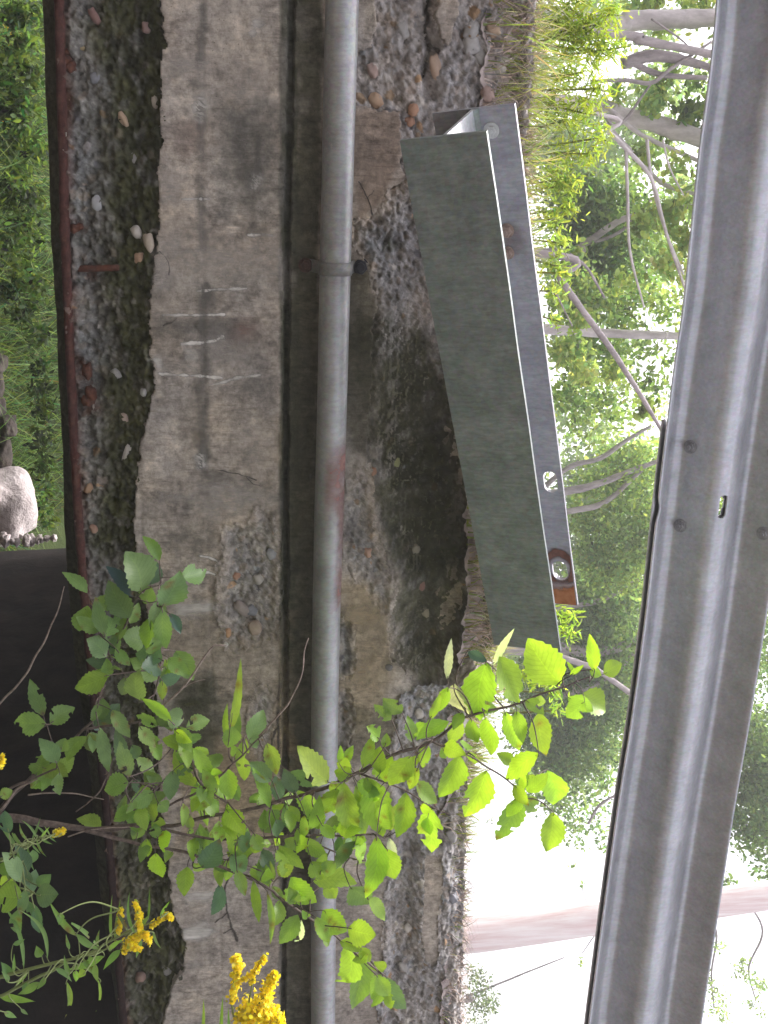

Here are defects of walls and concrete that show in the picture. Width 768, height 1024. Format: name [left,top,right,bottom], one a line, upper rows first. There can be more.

corrosion [54,0,119,609]
corrosion [83,631,96,674]
corrosion [95,748,127,1024]
spalling [57,0,172,610]
spalling [89,591,187,1024]
spalling [208,485,285,654]
damp [376,327,466,569]
spalling [342,0,537,1024]